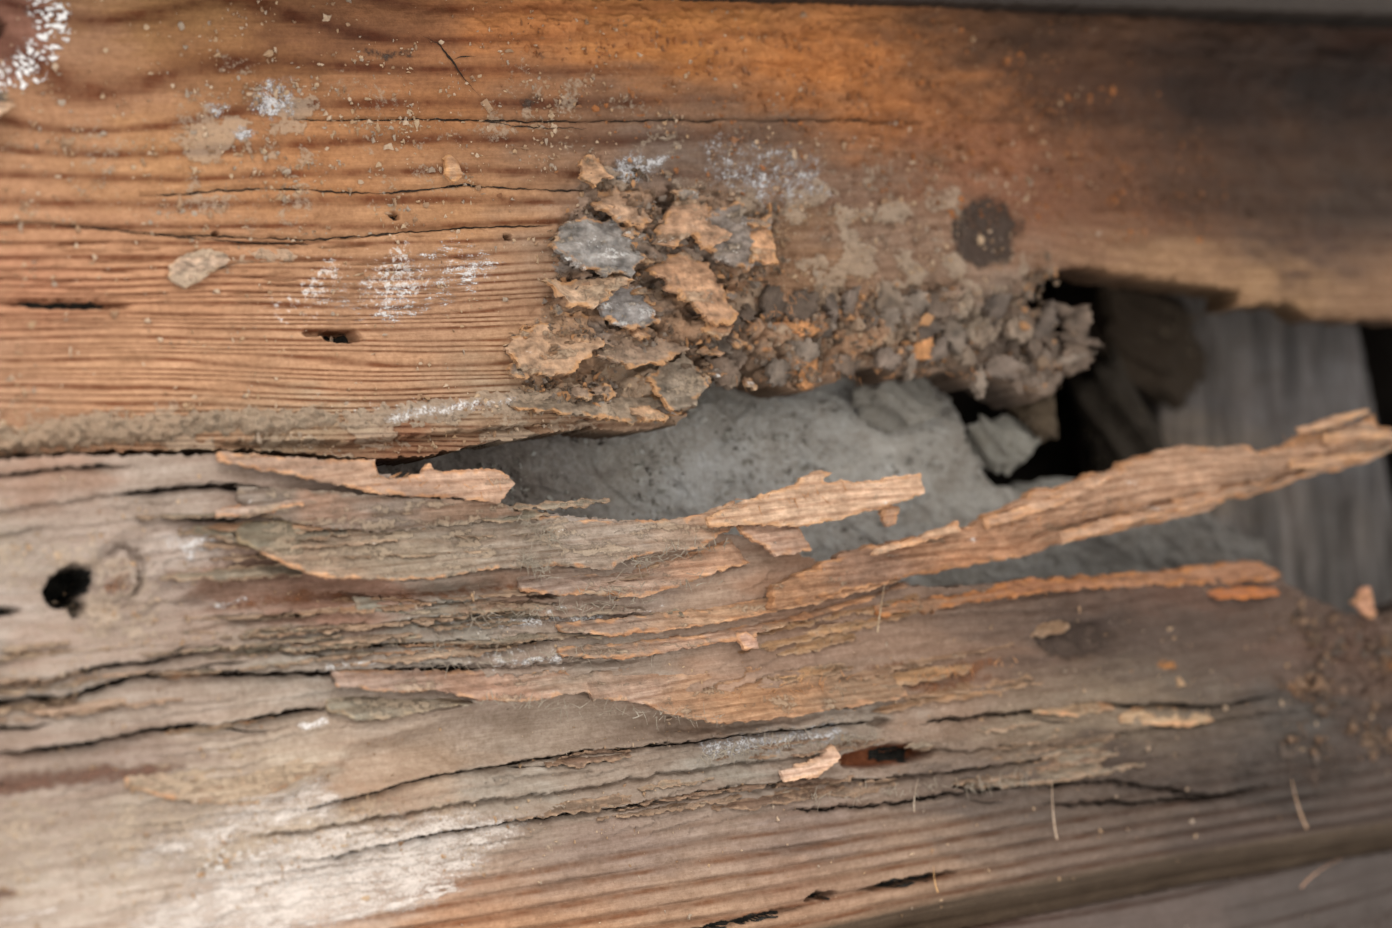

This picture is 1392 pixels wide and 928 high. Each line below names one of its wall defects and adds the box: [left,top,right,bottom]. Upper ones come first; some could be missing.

spalling [503,154,1106,426]
crack [0,464,243,523]
crack [0,612,558,788]
crack [919,710,1070,725]
crack [1111,694,1278,709]
crack [300,721,870,812]
crack [766,758,1275,812]
crack [322,788,727,859]